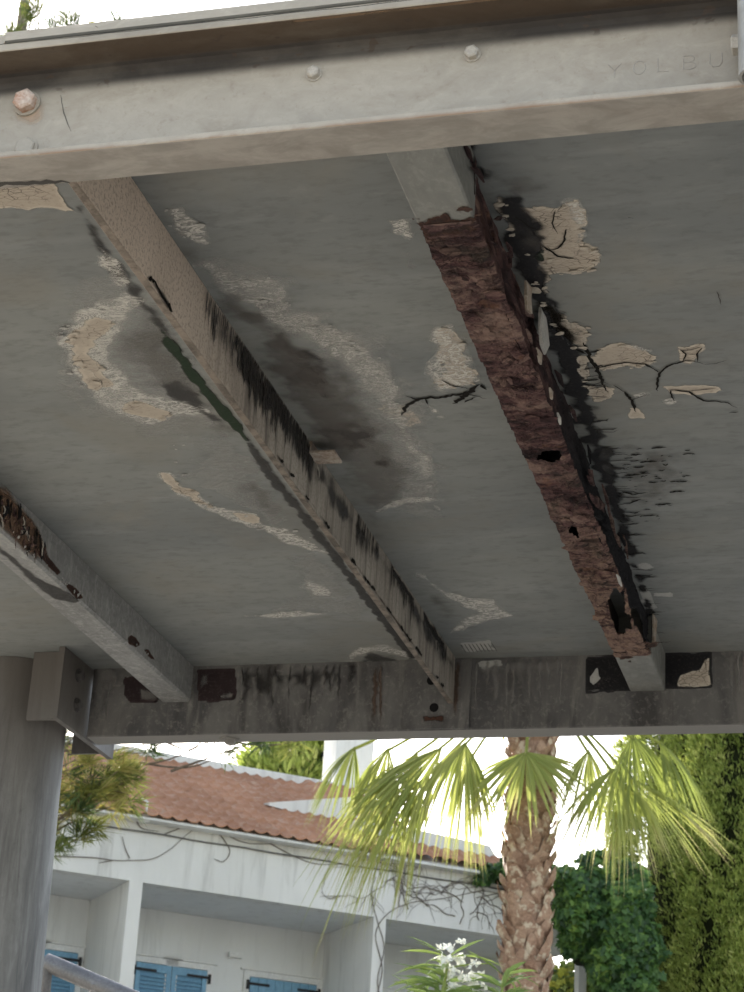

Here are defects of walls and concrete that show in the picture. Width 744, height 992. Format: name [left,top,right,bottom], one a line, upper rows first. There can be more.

spalling [493,197,656,402]
peeling [57,293,209,424]
water stain [204,263,434,558]
crack [377,380,487,426]
peeling [426,325,480,391]
rust [413,146,662,662]
water stain [499,197,695,615]
crack [575,343,736,419]
peeling [159,462,328,554]
water stain [391,566,447,659]
peeling [585,655,631,694]
peeling [665,652,713,689]